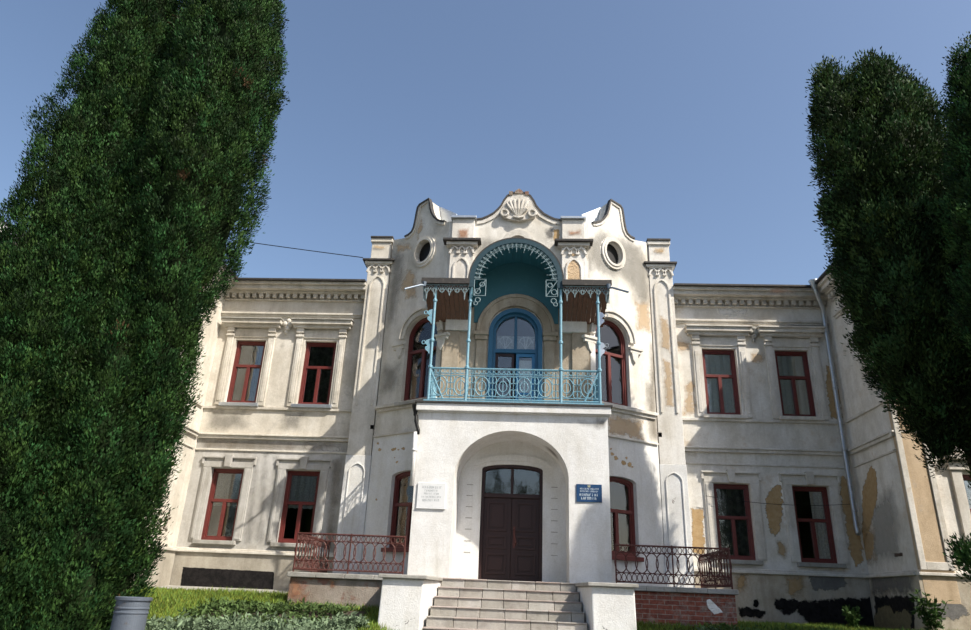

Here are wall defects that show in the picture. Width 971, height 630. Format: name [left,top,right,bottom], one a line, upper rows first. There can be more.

flaking render [637,304,650,330]
flaking render [661,319,688,405]
flaking render [684,382,695,414]
flaking render [609,416,642,439]
flaking render [691,508,705,554]
flaking render [765,485,785,556]
flaking render [840,466,878,567]